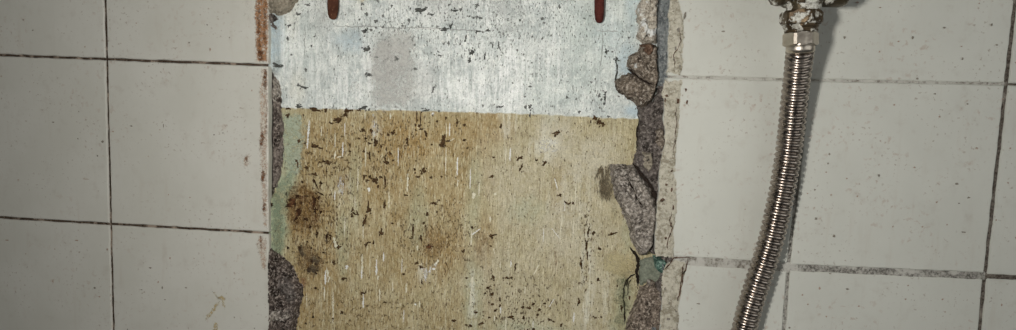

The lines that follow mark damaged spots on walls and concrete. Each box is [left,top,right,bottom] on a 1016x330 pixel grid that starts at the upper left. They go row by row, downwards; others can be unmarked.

spalling [268,0,310,41]
spalling [359,3,393,58]
spalling [434,4,509,63]
water stain [277,114,322,191]
spalling [349,128,395,189]
spalling [406,108,466,147]
peeling [590,0,689,330]
spalling [268,62,369,330]
spalling [350,201,386,226]
spalling [451,264,517,327]